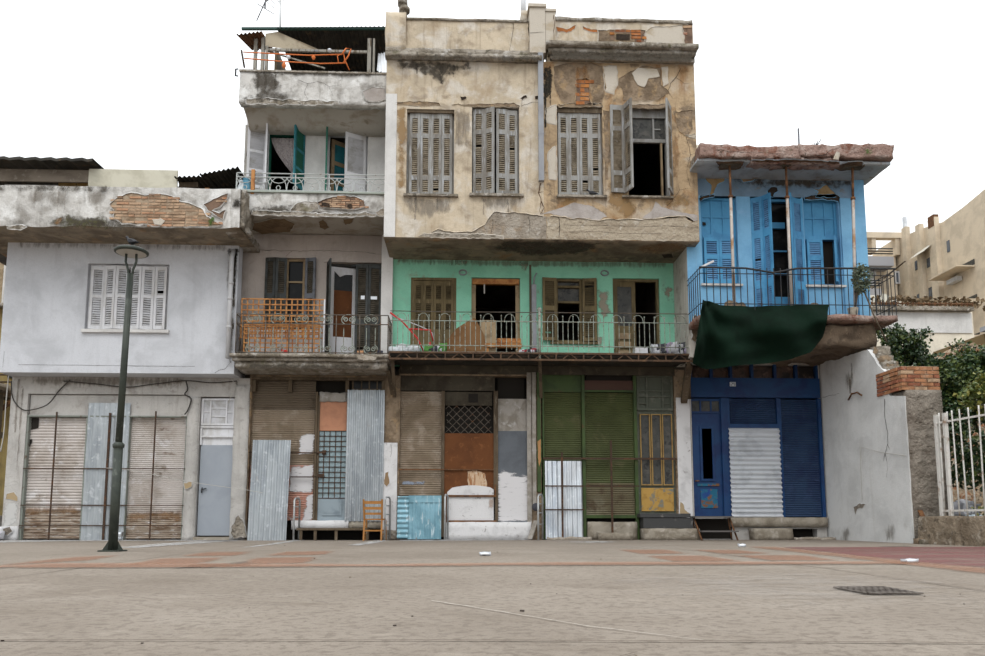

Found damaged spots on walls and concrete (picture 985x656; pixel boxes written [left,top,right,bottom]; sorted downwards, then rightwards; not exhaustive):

peeling [556,24,693,43]
leakage [390,56,487,84]
flaking render [362,87,440,107]
flaking render [453,62,696,181]
flaking render [109,191,229,228]
spalling [251,195,384,234]
spalling [419,201,699,241]